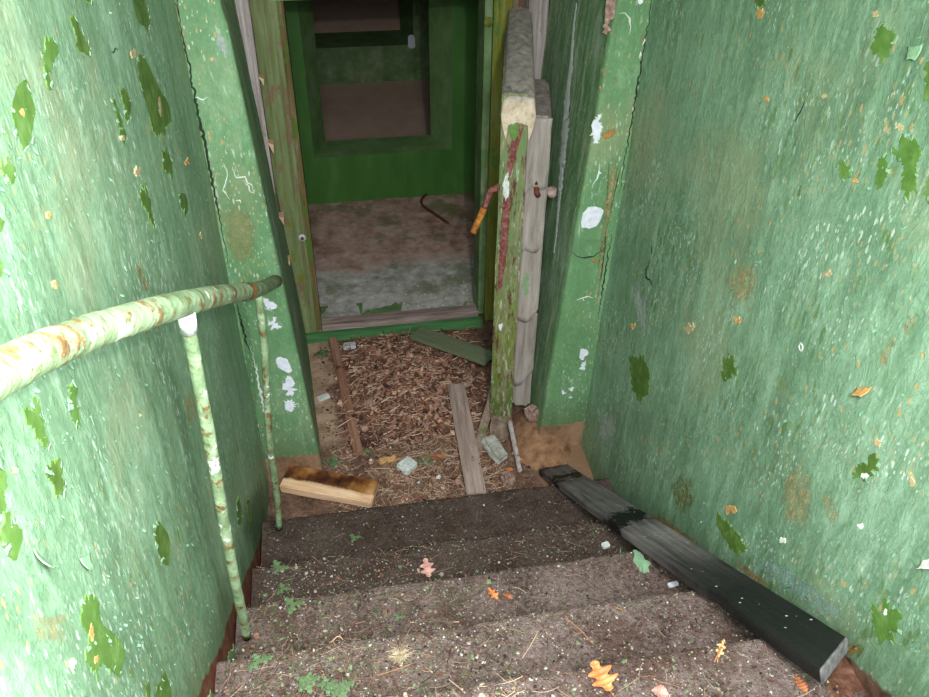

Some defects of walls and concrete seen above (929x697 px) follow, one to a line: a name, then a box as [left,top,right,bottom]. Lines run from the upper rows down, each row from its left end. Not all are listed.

peeling [0,79,42,191]
peeling [130,49,182,180]
crack [174,1,255,261]
crack [553,3,612,314]
crack [592,0,652,193]
peeling [699,494,747,557]
peeling [69,545,178,697]